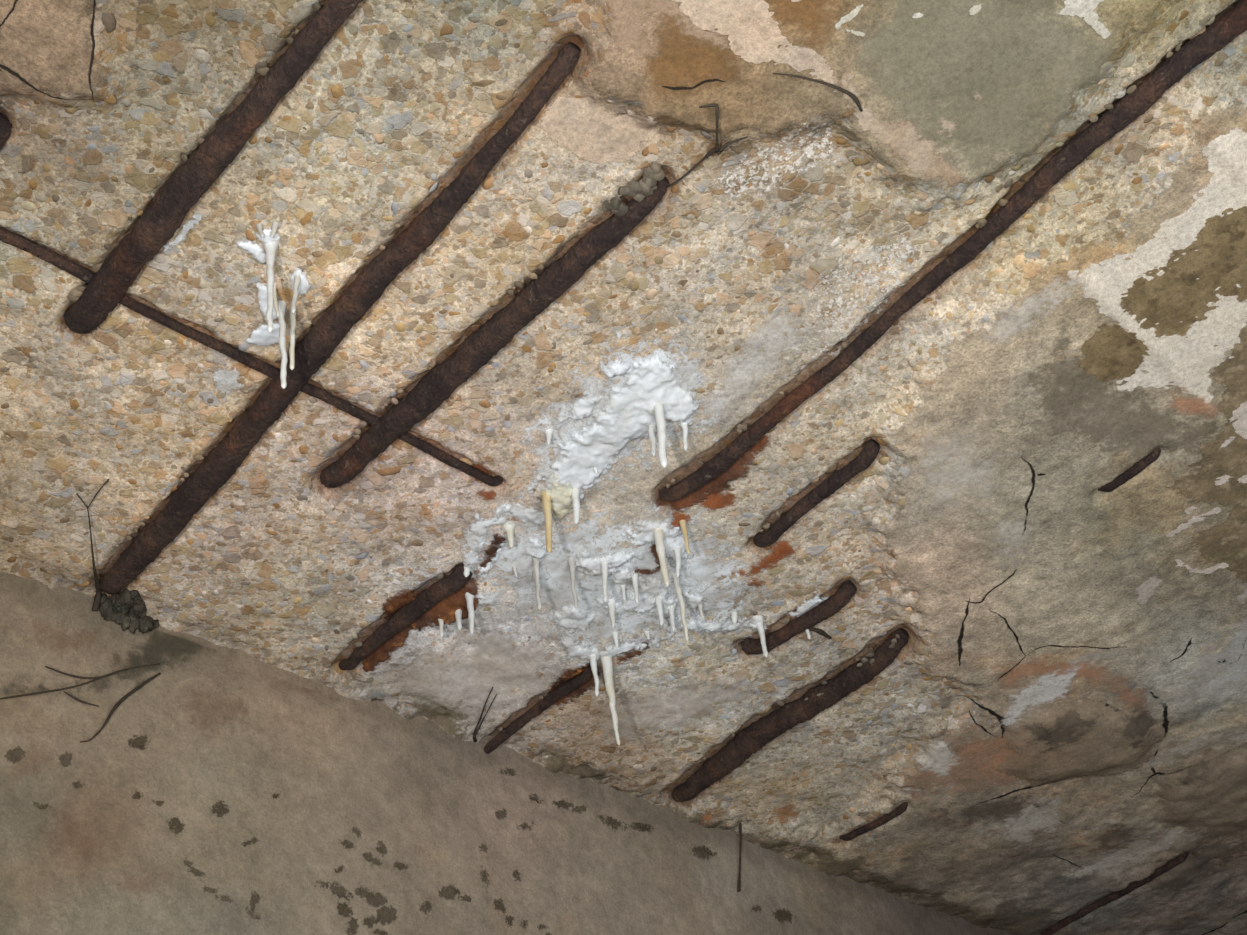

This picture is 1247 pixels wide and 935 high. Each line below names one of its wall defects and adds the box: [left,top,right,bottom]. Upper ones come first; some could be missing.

crack [0,0,96,100]
spalling [0,240,273,598]
spalling [0,0,329,273]
efflorescence [237,222,311,389]
corrosion [362,534,506,672]
corrosion [472,461,496,500]
efflorescence [389,233,917,746]
corrosion [655,435,770,528]
crack [957,455,1118,738]
water stain [1029,206,1247,583]
peeling [1066,127,1247,408]
crack [1132,692,1201,797]